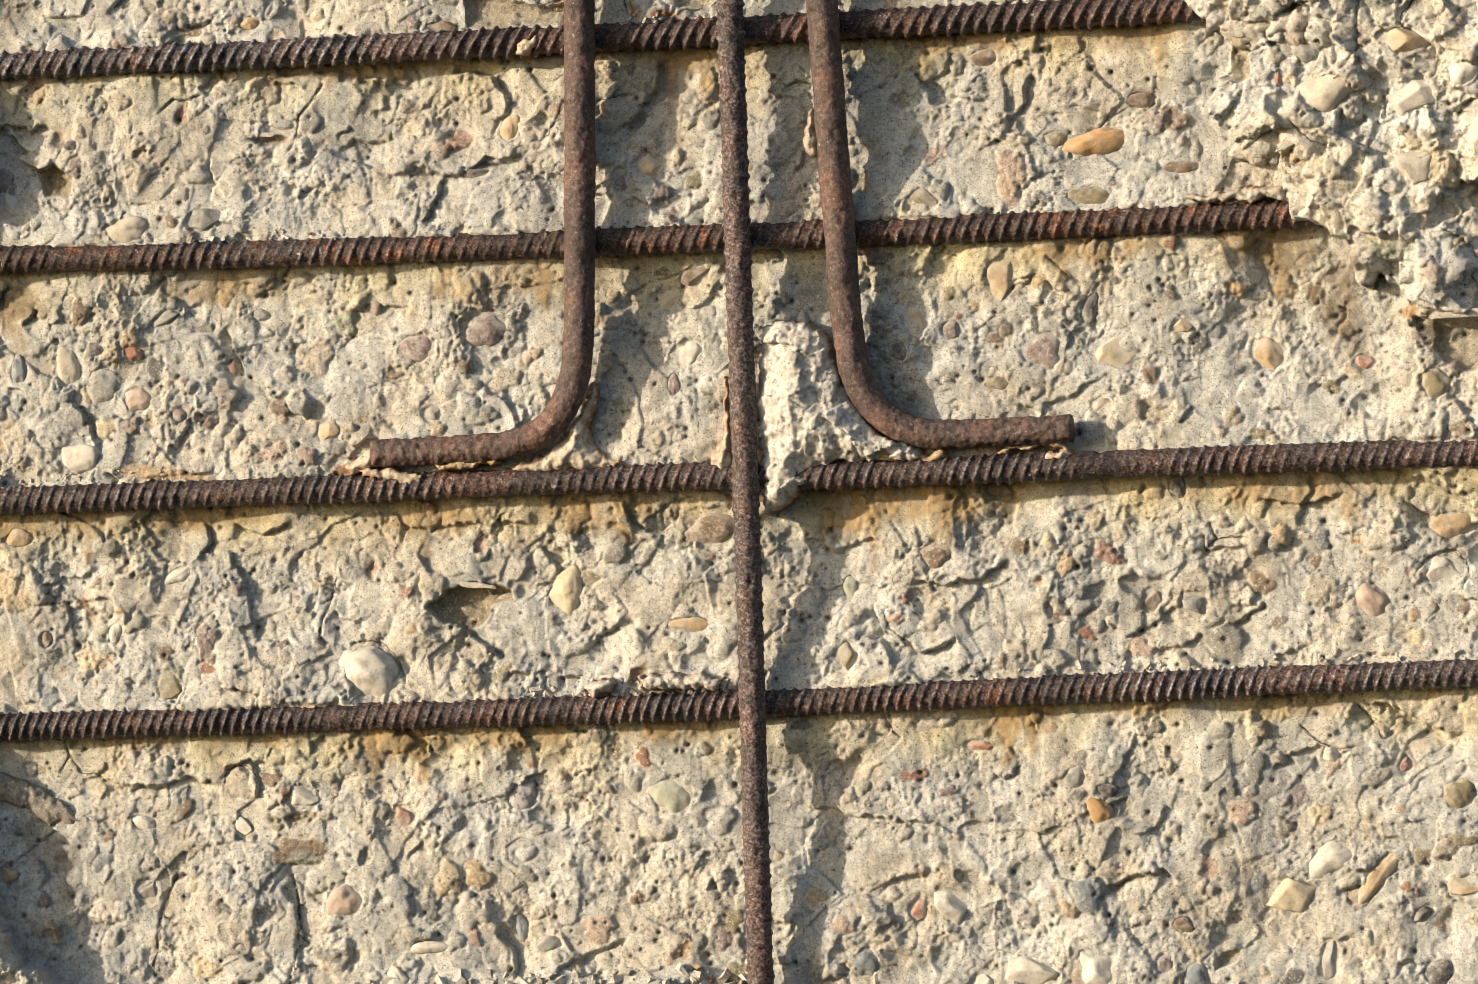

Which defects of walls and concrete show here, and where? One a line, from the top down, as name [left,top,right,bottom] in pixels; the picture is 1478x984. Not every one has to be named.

corrosion [869,29,1041,67]
corrosion [1105,22,1158,43]
spalling [744,0,1324,450]
spalling [1409,308,1478,374]
spalling [795,439,1478,491]
spalling [0,0,825,984]
corrosion [814,485,1012,536]
spalling [765,658,1478,719]
corrosion [348,729,429,778]
corrosion [474,726,529,749]
corrosion [983,704,1054,763]
spalling [1214,948,1246,973]